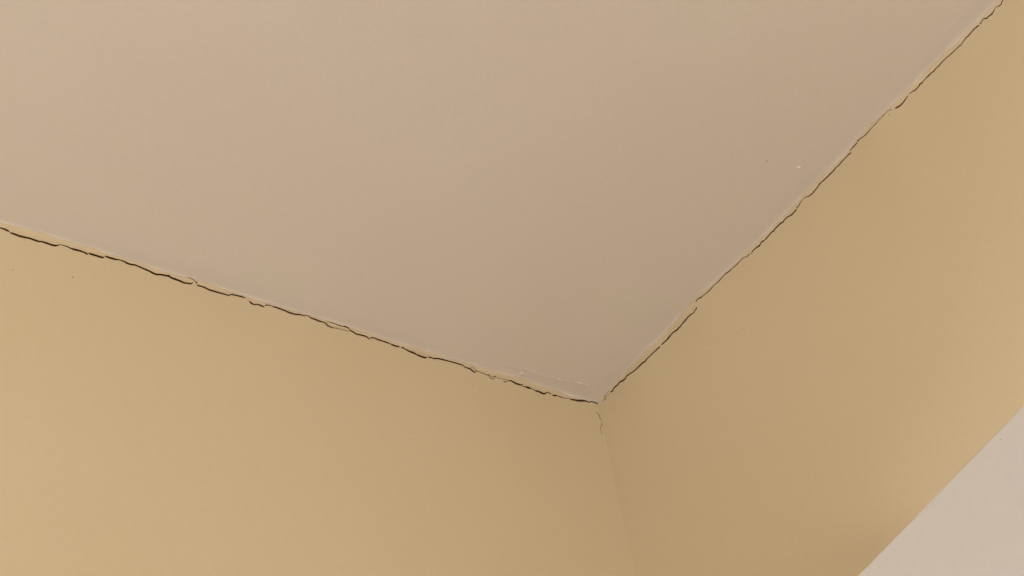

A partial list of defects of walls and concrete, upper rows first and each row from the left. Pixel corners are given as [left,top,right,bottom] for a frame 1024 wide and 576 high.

crack [0,0,1003,434]